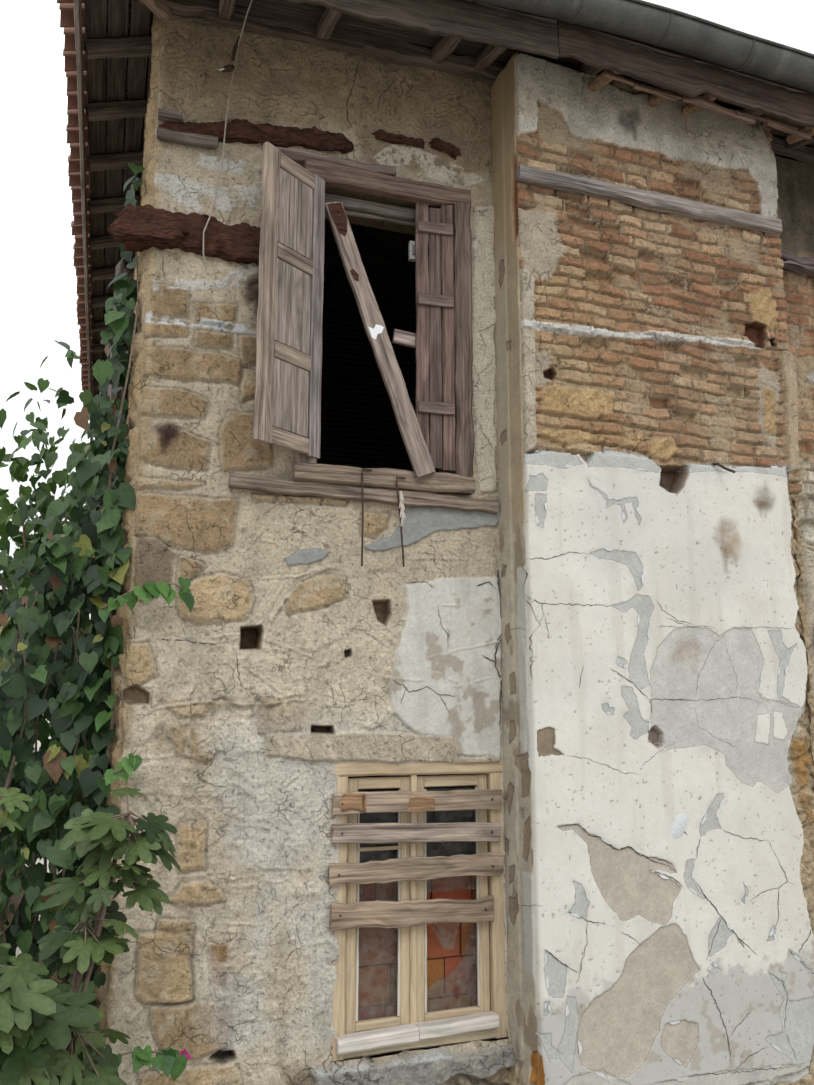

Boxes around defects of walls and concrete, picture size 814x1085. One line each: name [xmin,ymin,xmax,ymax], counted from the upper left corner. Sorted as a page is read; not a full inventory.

spalling [744,327,773,348]
crack [394,681,457,711]
crack [477,552,619,721]
peeling [590,548,803,793]
crack [613,602,792,747]
peeling [699,794,724,836]
peeling [529,825,814,1085]
crack [546,824,814,1083]